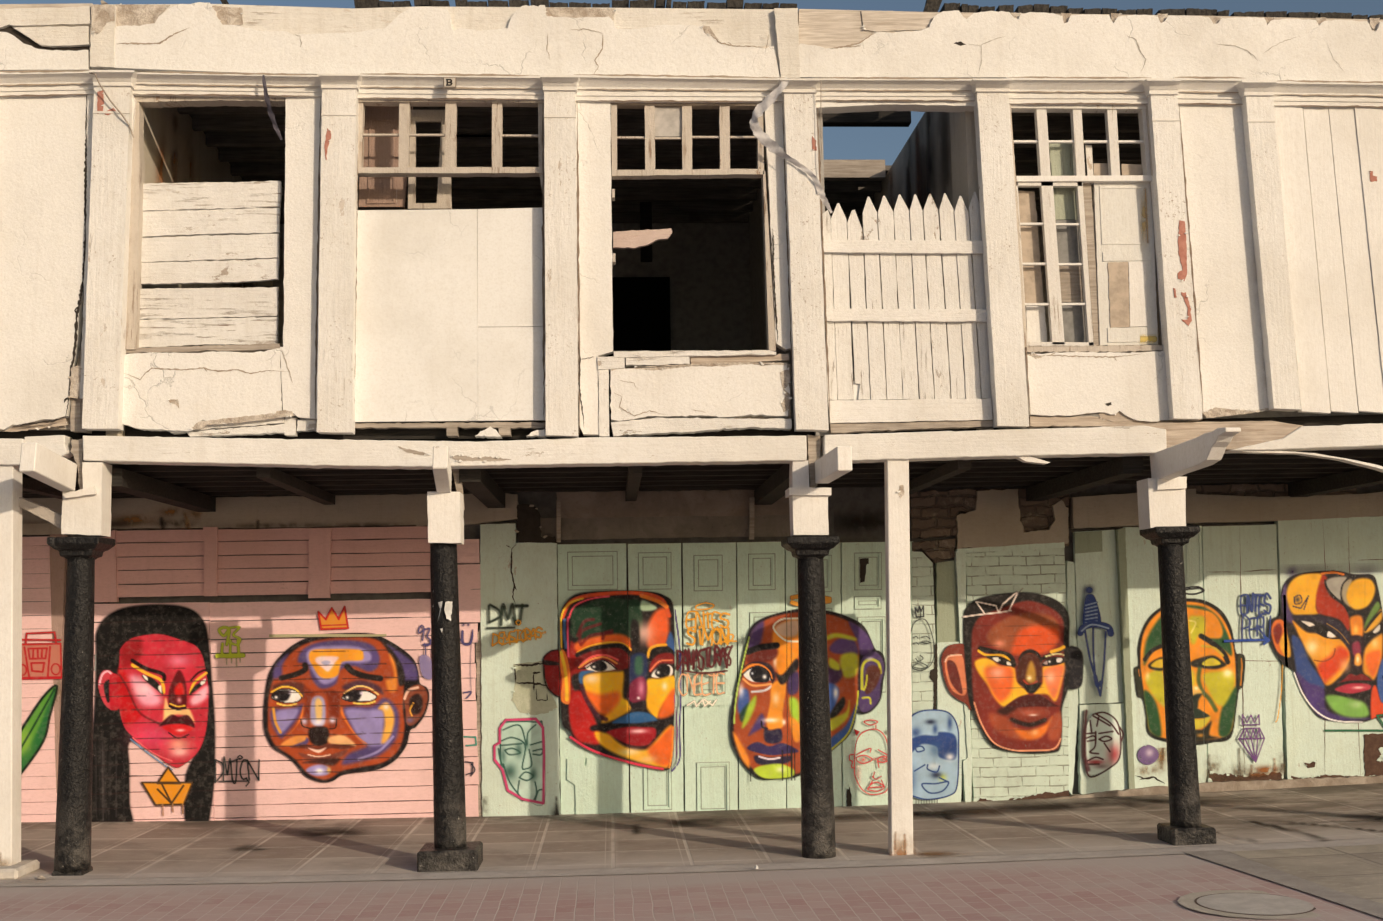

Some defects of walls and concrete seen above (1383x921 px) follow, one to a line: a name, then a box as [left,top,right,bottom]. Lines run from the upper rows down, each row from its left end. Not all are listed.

spalling [89,4,170,34]
spalling [212,5,243,25]
spalling [861,10,938,32]
crack [0,26,190,51]
crack [12,115,87,427]
crack [124,352,292,380]
spalling [897,485,1069,563]